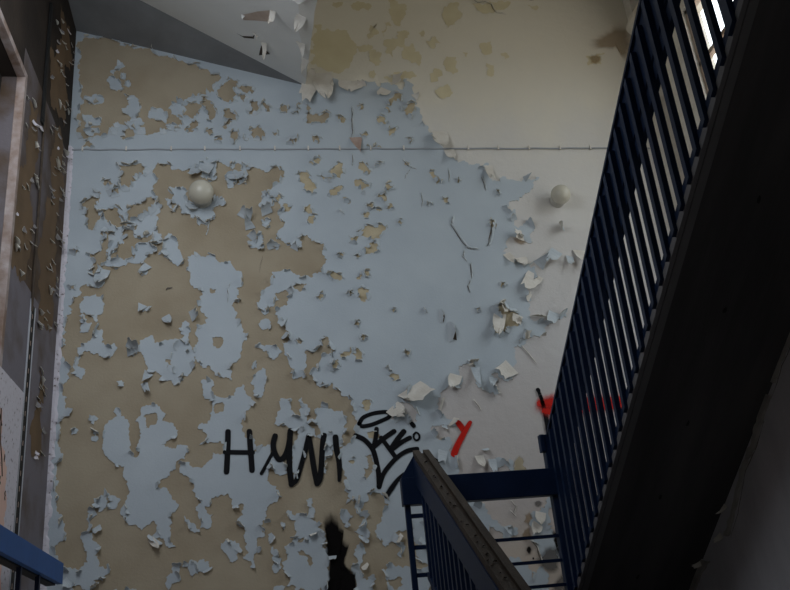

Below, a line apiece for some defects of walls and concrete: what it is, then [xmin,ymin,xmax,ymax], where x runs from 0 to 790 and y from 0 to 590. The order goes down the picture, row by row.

peeling [11,0,631,590]
peeling [586,139,670,397]